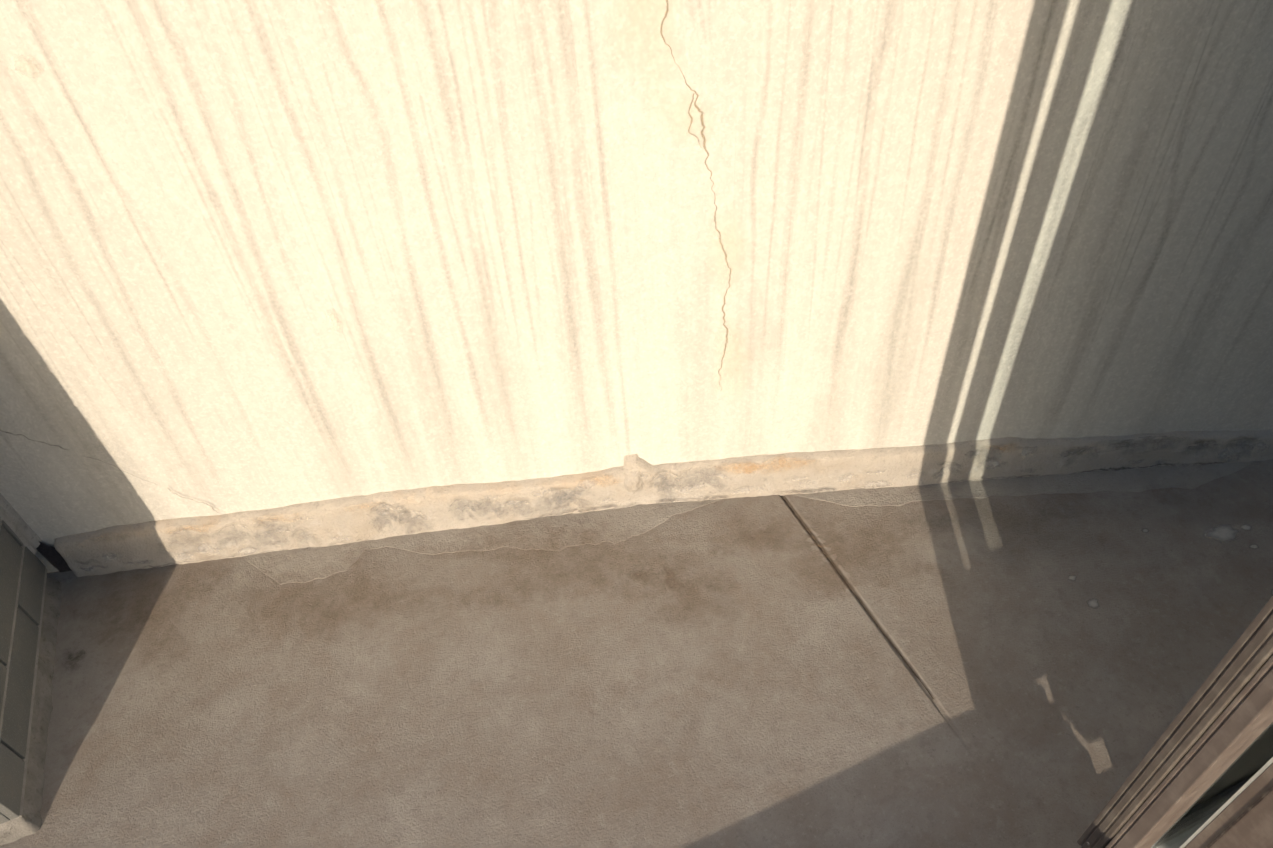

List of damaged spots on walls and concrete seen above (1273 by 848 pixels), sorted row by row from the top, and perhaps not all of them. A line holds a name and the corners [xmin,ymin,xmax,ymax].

crack [661,0,731,370]